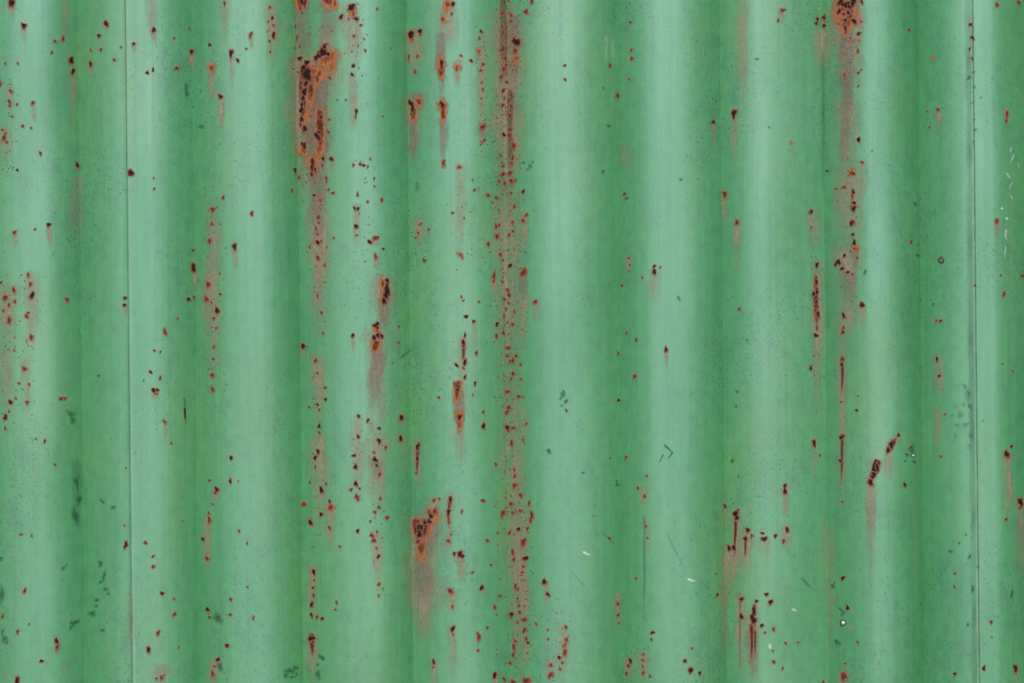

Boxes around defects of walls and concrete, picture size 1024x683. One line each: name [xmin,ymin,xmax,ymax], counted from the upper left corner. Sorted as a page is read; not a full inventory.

rust [291,0,368,343]
rust [814,0,865,334]
rust [0,272,38,430]
rust [187,195,237,408]
rust [370,275,391,398]
rust [436,0,570,683]
rust [809,256,823,378]
rust [349,414,389,598]
rust [411,496,474,622]
rust [736,592,775,658]
rust [724,503,790,574]
rust [867,432,900,515]